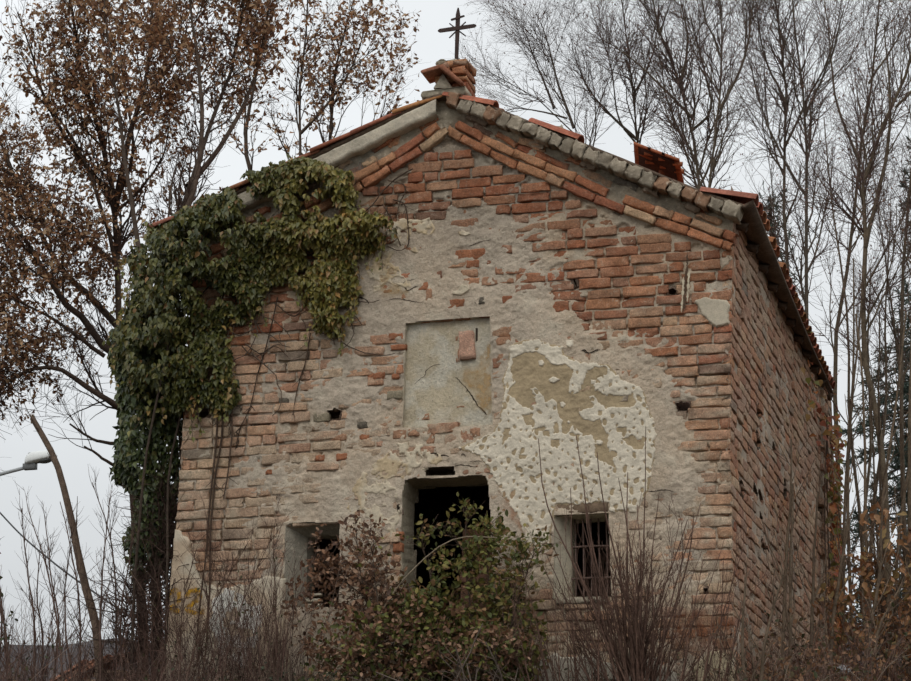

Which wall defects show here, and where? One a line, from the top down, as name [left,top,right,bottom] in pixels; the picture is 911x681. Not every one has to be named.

crack [418,364,487,415]
peeling [347,442,443,537]
peeling [459,339,657,557]